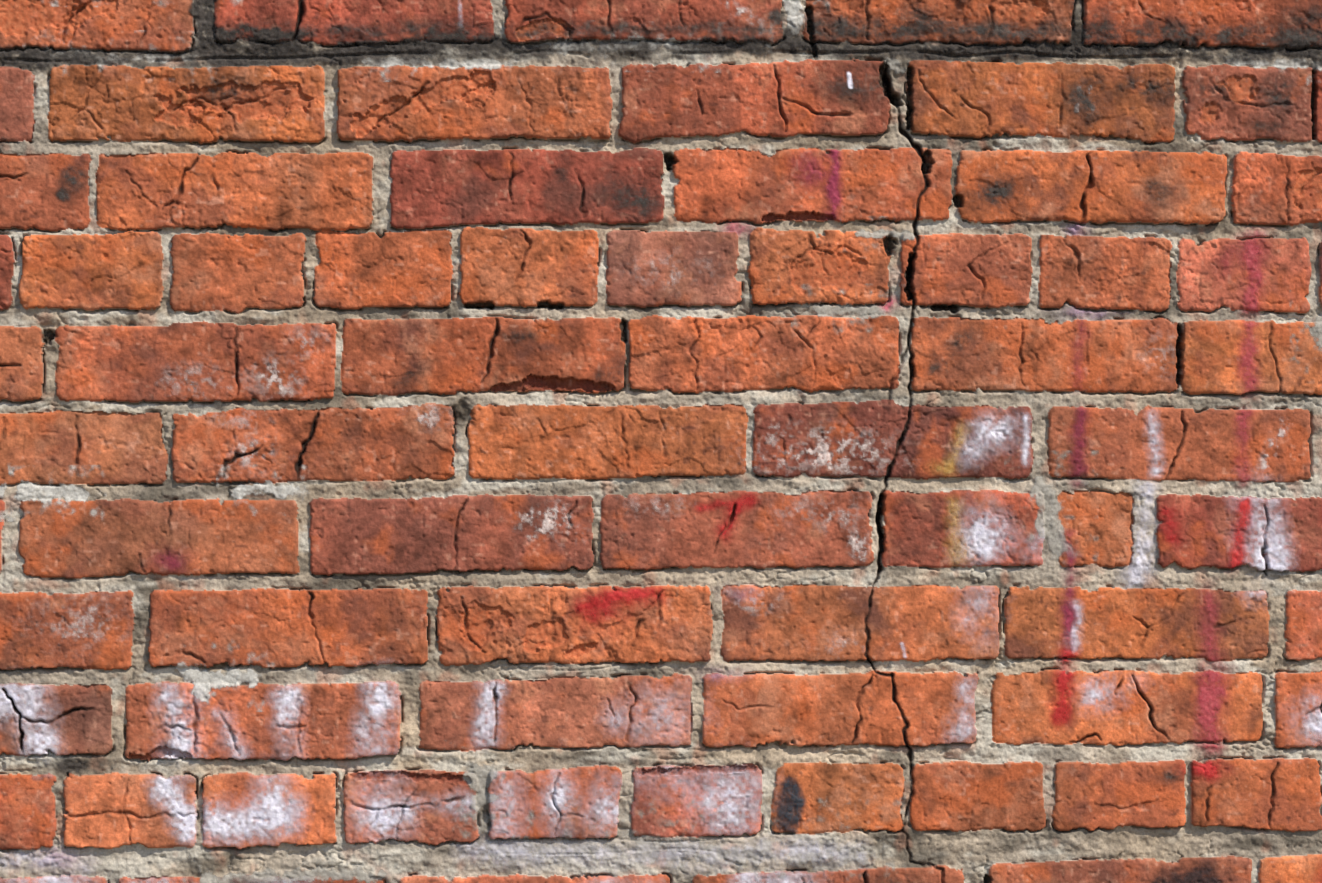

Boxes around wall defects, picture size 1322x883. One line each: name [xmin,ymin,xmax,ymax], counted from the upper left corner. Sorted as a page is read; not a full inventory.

crack [224,446,261,477]
crack [295,412,318,475]
crack [865,38,944,872]
crack [2,689,24,752]
water stain [14,686,57,755]
water stain [276,689,302,727]
water stain [358,683,392,752]
crack [1117,682,1159,731]
water stain [254,780,289,829]